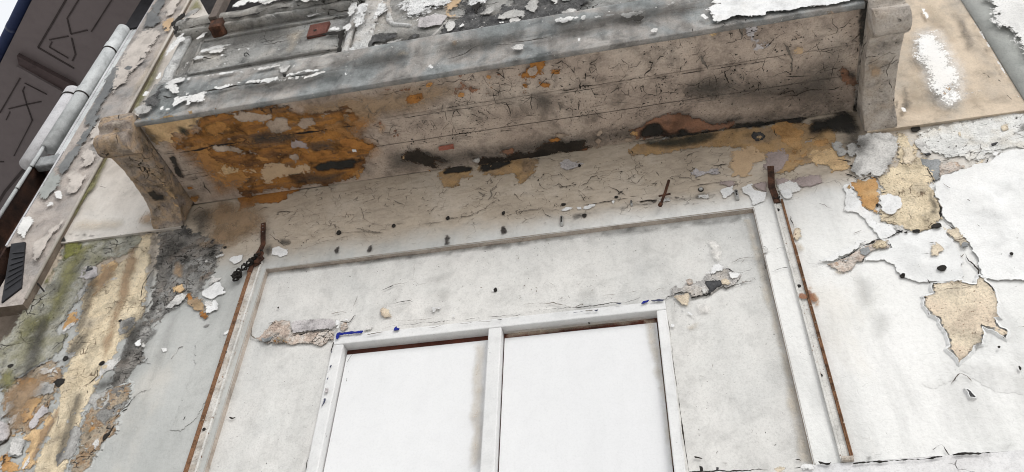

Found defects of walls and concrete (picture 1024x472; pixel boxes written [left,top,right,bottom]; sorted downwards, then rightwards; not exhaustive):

peeling [16,216,63,261]
peeling [134,0,377,213]
water stain [171,86,448,192]
crack [247,152,733,249]
water stain [394,137,593,171]
crack [168,5,851,154]
peeling [592,113,1024,367]
peeling [0,233,154,472]
water stain [60,207,261,461]
peeling [161,275,229,431]
spalling [256,311,354,353]
corrosion [795,245,853,456]